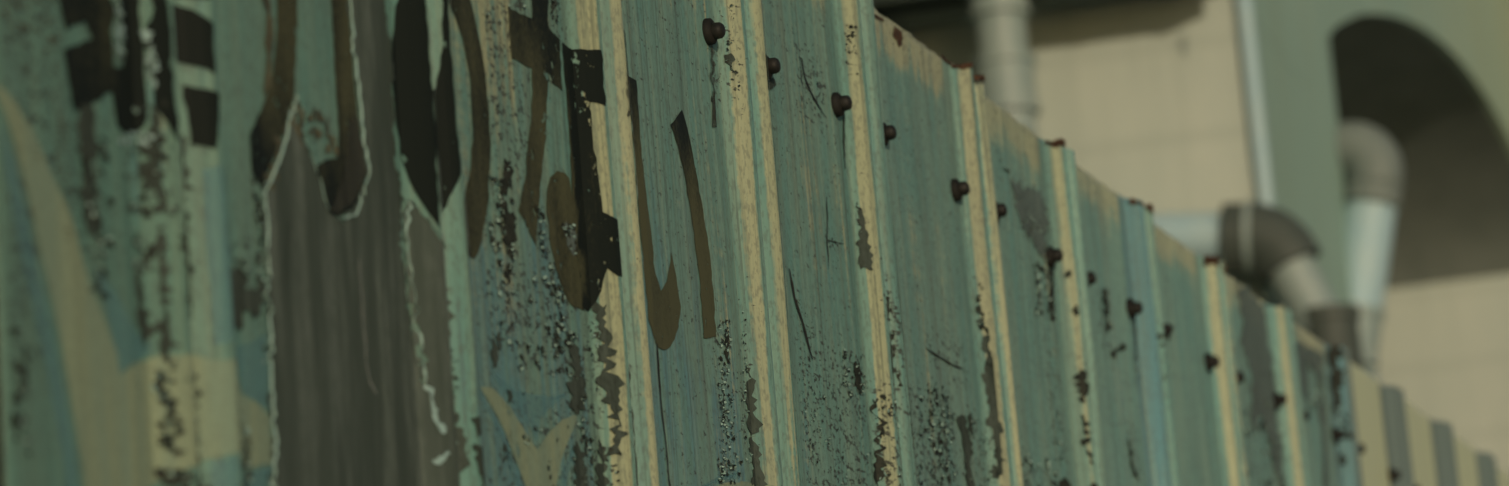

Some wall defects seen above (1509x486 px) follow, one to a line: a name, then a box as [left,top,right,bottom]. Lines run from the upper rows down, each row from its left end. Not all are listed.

peeling [76,0,211,486]
peeling [230,0,629,486]
peeling [724,40,741,98]
peeling [762,5,1094,486]
peeling [1235,282,1285,486]
peeling [1296,340,1354,486]